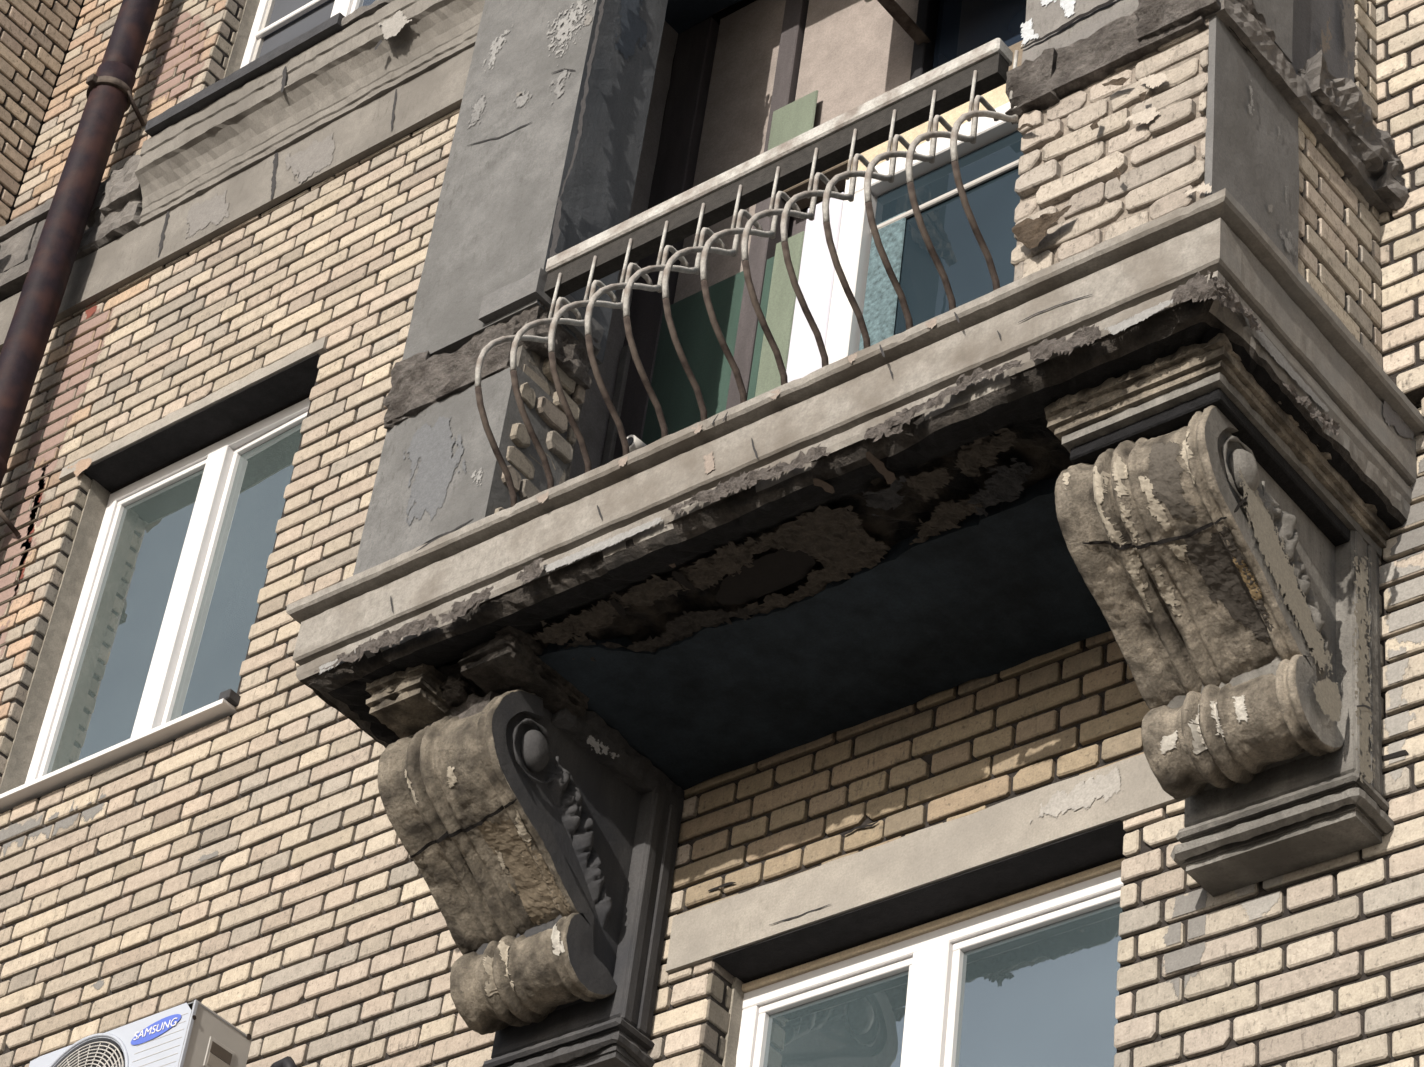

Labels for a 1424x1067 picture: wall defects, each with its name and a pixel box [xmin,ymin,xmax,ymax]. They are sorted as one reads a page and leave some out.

peeling [513,0,595,108]
peeling [1020,0,1076,46]
flaking render [1011,18,1210,281]
spalling [516,271,1340,661]
crack [1083,496,1247,550]
peeling [1238,468,1409,783]
crack [410,799,517,858]